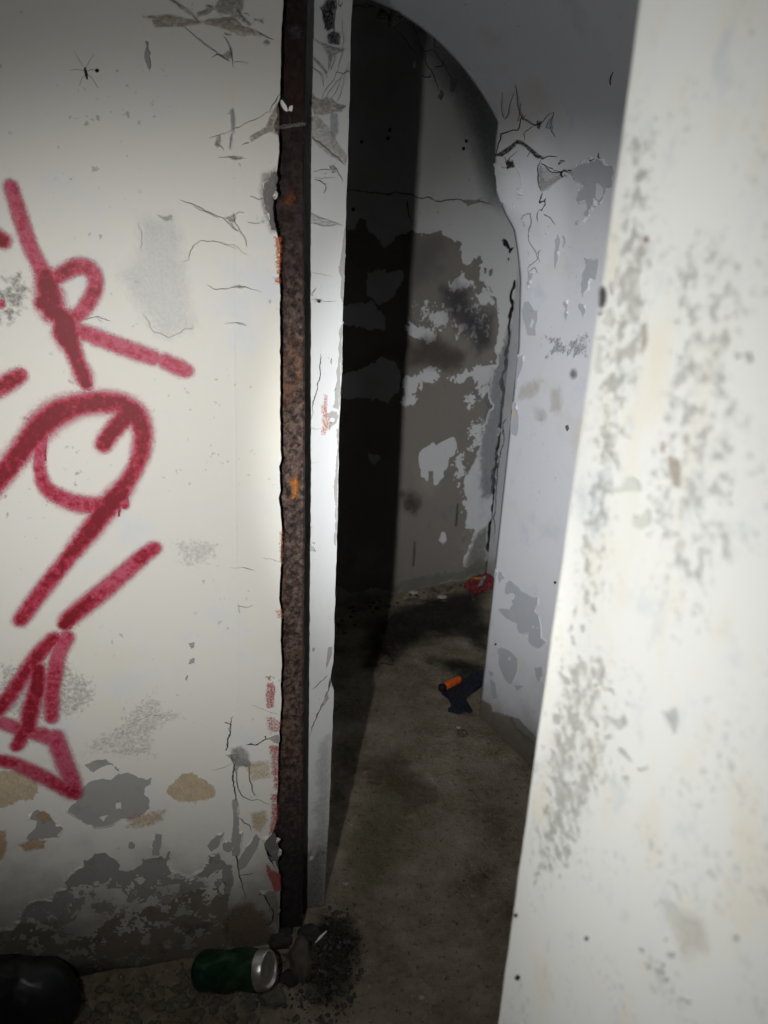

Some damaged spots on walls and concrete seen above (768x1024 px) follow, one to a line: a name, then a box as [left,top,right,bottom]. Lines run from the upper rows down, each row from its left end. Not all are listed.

crack [348,190,495,220]
peeling [536,154,613,226]
peeling [328,218,502,594]
crack [485,193,554,573]
peeling [494,569,547,649]
peeling [489,646,523,699]
peeling [0,759,152,840]
peeling [167,773,215,801]
crack [224,705,279,925]
peeling [0,799,282,972]